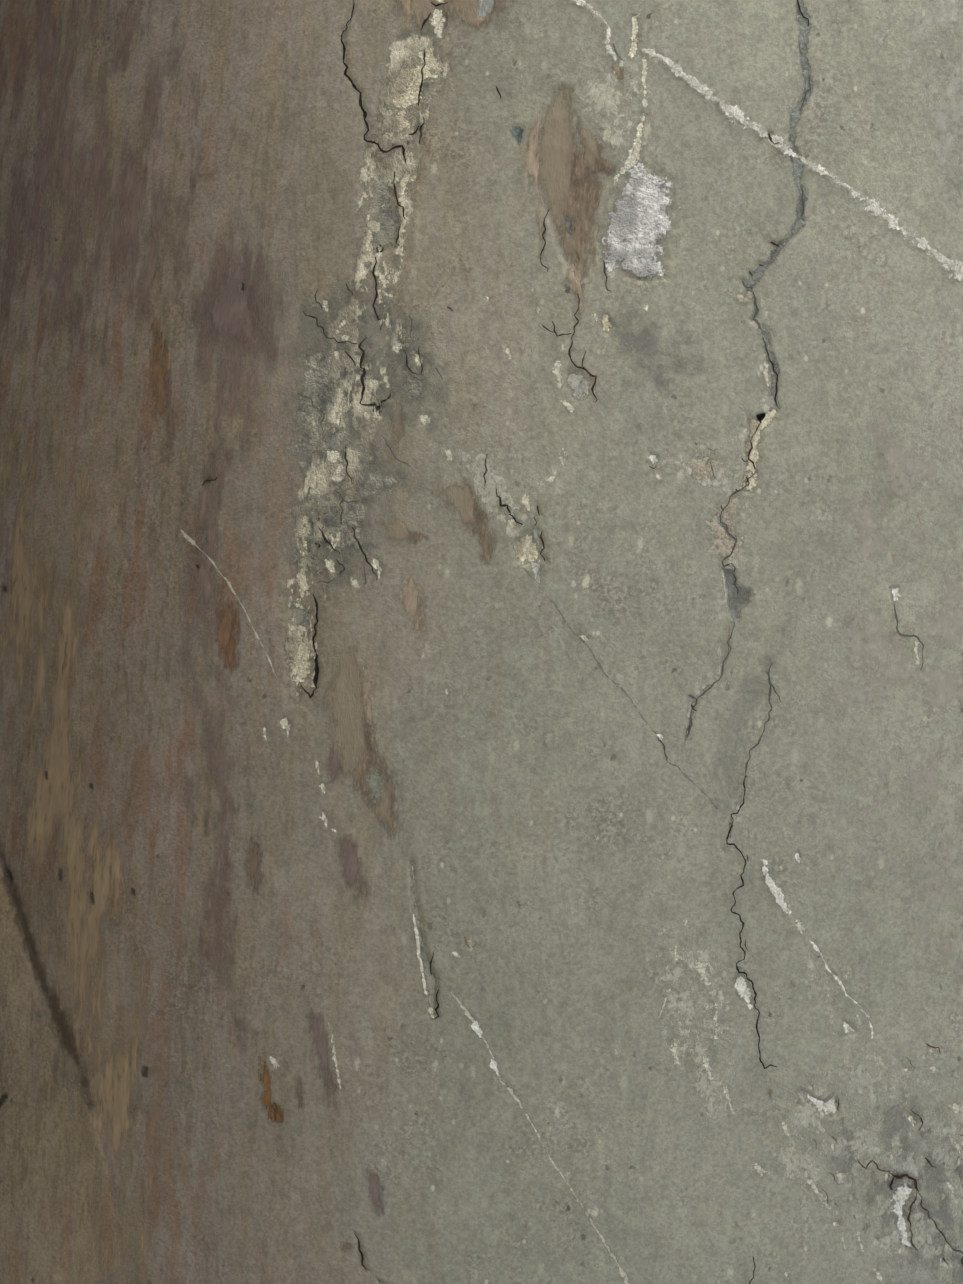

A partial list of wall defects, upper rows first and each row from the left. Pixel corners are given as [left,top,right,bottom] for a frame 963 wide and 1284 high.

spalling [384,0,448,144]
peeling [478,0,494,17]
spalling [362,160,416,272]
crack [737,0,813,409]
crack [542,271,613,403]
peeling [284,282,431,590]
crack [720,472,756,562]
spalling [286,594,319,698]
crack [684,622,735,745]
crack [892,587,924,671]
crack [726,663,781,1069]
crack [858,1110,963,1265]